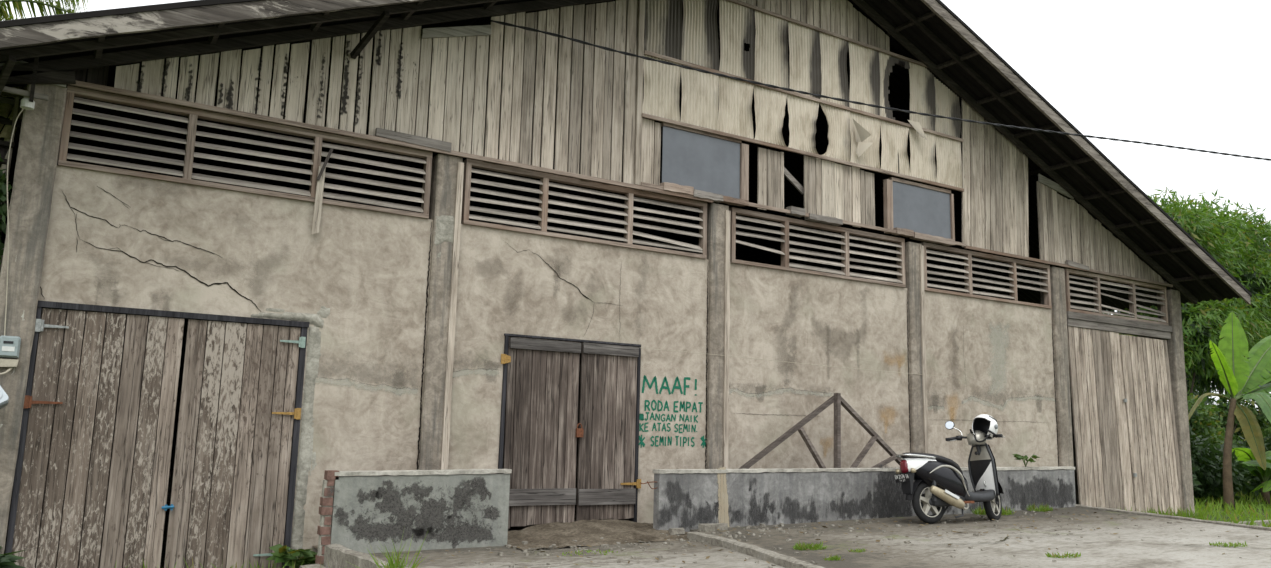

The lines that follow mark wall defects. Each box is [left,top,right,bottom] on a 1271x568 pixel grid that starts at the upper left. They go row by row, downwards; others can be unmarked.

crack [61,186,258,309]
crack [507,243,621,335]